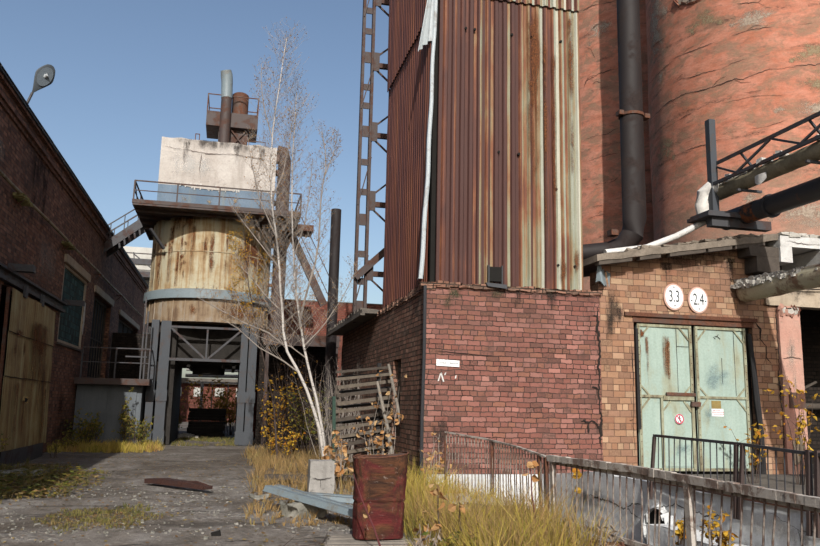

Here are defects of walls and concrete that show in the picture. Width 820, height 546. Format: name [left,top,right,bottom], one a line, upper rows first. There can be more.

rust [528,15,557,221]
crack [584,1,614,86]
crack [648,42,820,127]
crack [734,0,772,35]
rust [150,217,215,284]
rust [238,238,265,277]
damp [607,297,621,334]
crack [581,298,603,458]
crack [756,310,800,448]